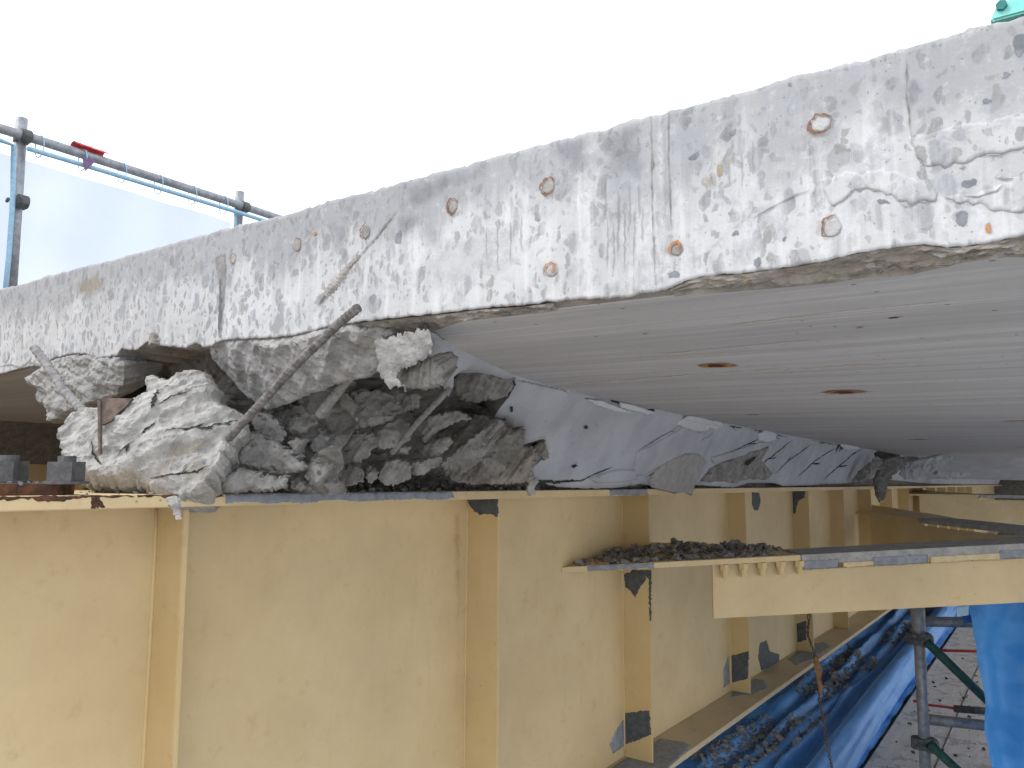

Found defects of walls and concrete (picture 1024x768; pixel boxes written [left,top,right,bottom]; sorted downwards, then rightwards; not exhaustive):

corrosion [807,113,831,135]
crack [963,149,1024,197]
corrosion [446,198,457,216]
crack [838,187,935,207]
corrosion [821,214,842,237]
corrosion [667,240,683,256]
corrosion [543,262,558,277]
spalling [225,303,557,442]
spalling [25,345,163,423]
peeling [216,491,454,504]
peeling [467,499,499,517]
peeling [610,710,692,768]